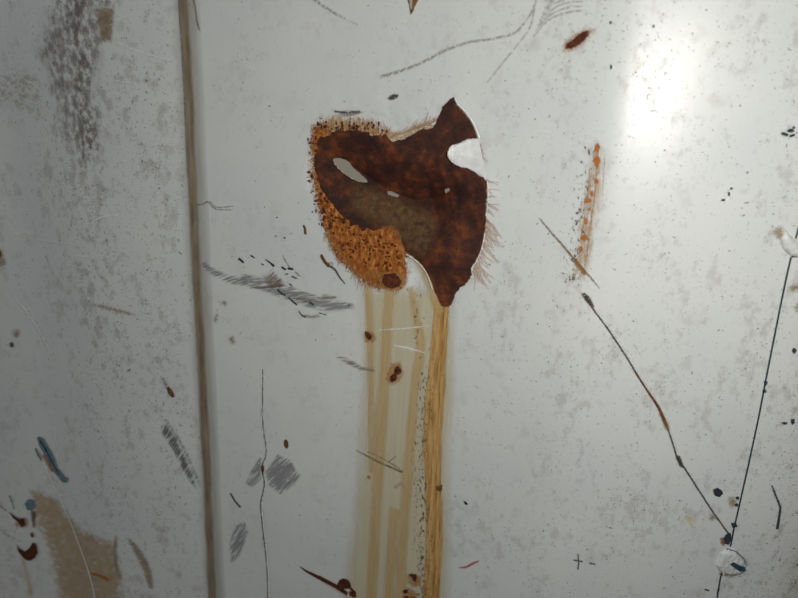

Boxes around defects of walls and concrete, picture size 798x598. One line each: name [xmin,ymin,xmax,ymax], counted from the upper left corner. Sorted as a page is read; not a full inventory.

rust [565,31,591,50]
rust [562,144,600,286]
rust [307,117,448,598]
crack [260,369,270,598]